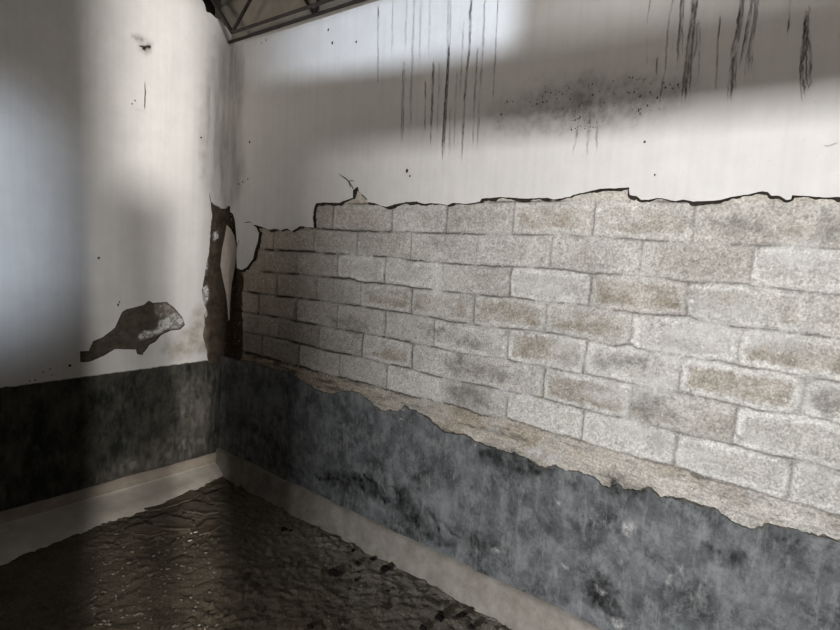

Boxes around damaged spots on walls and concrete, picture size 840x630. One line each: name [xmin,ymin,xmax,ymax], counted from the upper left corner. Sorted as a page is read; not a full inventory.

spalling [80,301,185,362]
spalling [202,187,840,542]
leakage [588,581,616,616]